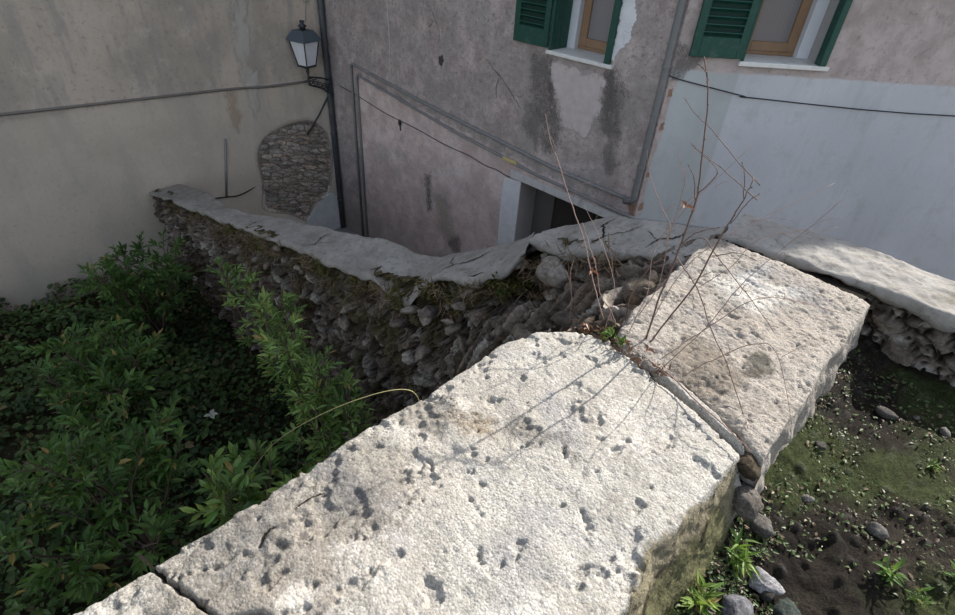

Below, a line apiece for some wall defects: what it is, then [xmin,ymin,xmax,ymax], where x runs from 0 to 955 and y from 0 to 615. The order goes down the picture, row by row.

spalling [257,120,333,221]
leakage [525,54,559,153]
leakage [600,70,629,174]
crack [591,218,684,245]
crack [136,554,208,614]